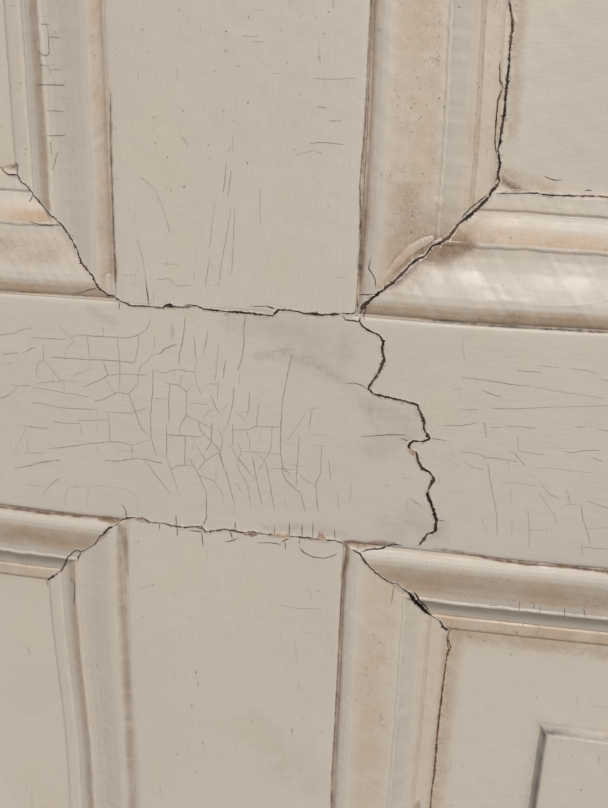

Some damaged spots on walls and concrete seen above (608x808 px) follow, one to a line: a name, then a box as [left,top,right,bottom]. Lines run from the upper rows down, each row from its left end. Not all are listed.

crack [0,0,608,555]
crack [0,320,453,808]